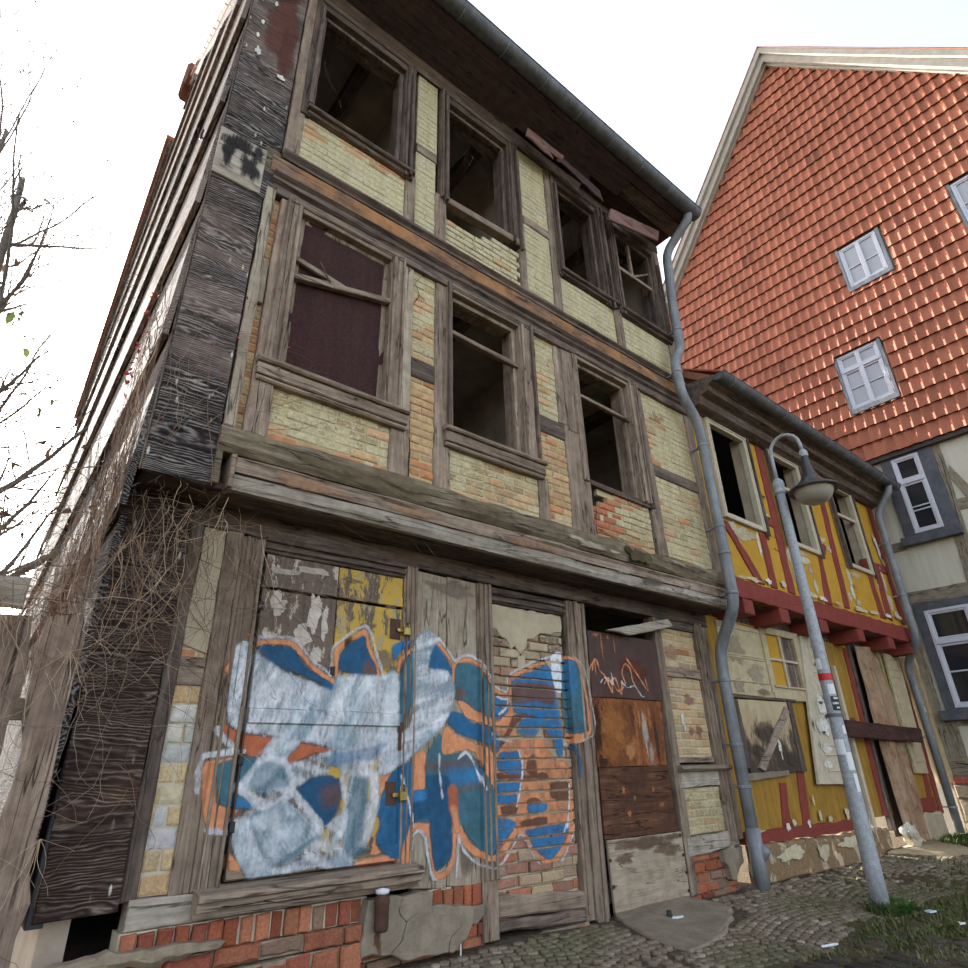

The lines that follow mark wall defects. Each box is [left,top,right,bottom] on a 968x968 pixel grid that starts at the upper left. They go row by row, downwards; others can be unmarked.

peeling [271,566,329,576]
peeling [270,589,288,616]
peeling [293,594,328,665]
flaking render [492,604,562,671]
peeling [812,689,833,769]
peeling [786,796,833,831]
peeling [775,844,805,862]
peeling [818,835,857,862]